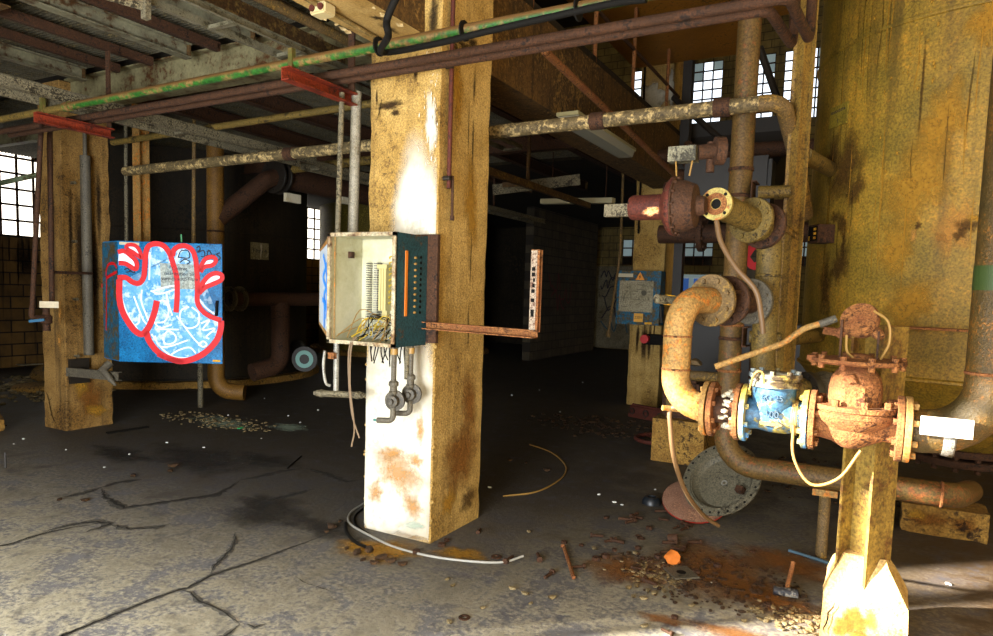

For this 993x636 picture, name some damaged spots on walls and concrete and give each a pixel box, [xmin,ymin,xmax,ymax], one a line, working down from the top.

damp [376,91,401,116]
damp [396,74,438,235]
damp [364,346,433,540]
corrosion [384,449,422,486]
corrosion [444,376,476,512]
crack [0,468,361,546]
crack [61,534,326,636]
corrosion [645,613,681,625]
corrosion [596,545,827,614]
corrosion [697,623,758,636]